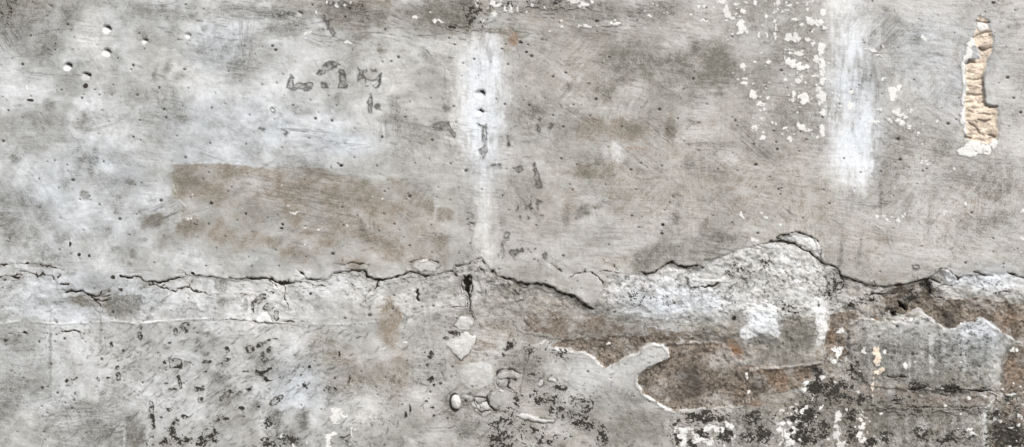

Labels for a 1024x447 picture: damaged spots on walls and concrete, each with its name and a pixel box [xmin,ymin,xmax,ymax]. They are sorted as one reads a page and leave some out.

leakage [0,0,27,34]
leakage [137,0,601,396]
crack [0,254,741,340]
peeling [423,284,462,361]
spalling [483,263,1024,447]
spalling [643,0,1000,175]
leakage [803,0,896,248]
crack [752,228,1024,302]